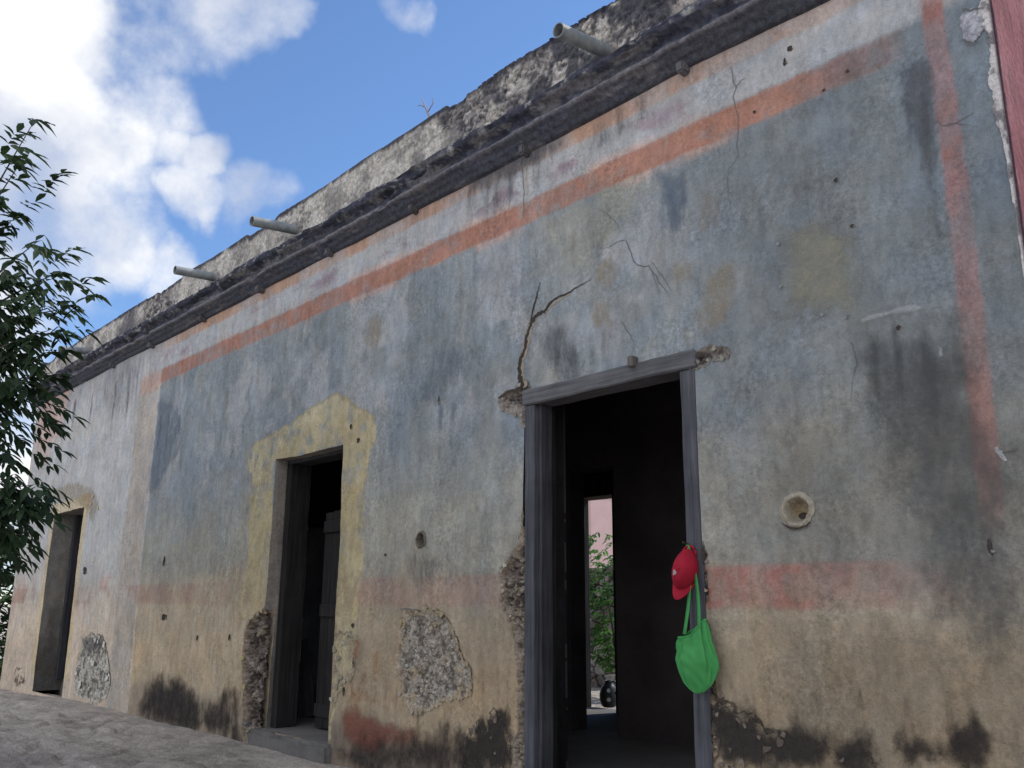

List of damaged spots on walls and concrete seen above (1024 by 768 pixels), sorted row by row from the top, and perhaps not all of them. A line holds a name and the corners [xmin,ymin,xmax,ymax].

spalling [977,0,1024,276]
crack [599,209,672,296]
crack [498,279,591,399]
spalling [497,380,530,428]
peeling [73,632,111,705]
spalling [395,604,473,717]
spalling [465,508,525,768]
water stain [141,677,239,741]
water stain [350,709,511,768]
water stain [710,704,872,768]
water stain [895,717,990,768]